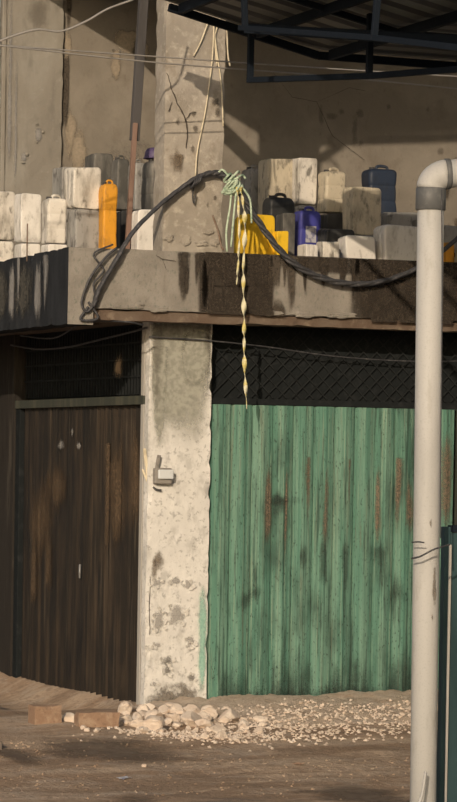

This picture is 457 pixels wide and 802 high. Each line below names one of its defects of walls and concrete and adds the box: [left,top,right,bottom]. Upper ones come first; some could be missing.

water stain [0,255,48,316]
water stain [178,252,417,323]
water stain [443,262,457,324]
rust [105,436,140,538]
rust [396,458,413,523]
peeling [150,577,196,590]
peeling [150,604,189,690]